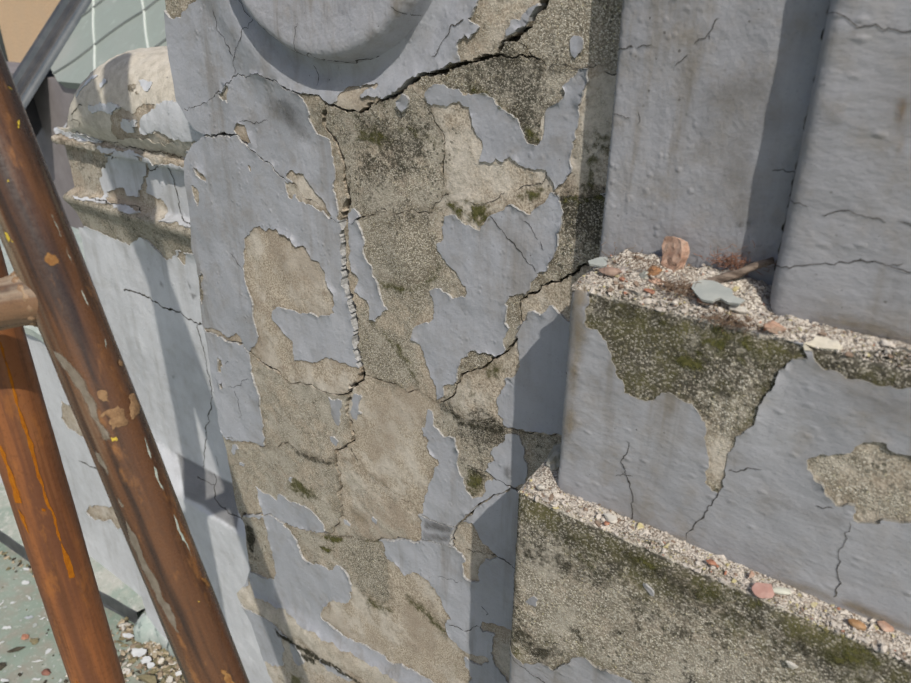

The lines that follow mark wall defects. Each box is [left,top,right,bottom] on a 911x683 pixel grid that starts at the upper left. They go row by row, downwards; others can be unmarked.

crack [351,0,617,111]
crack [831,12,911,33]
peeling [51,46,196,265]
crack [470,175,605,298]
crack [776,260,911,273]
peeling [205,0,911,683]
peeling [61,401,83,436]
crack [124,289,247,475]
peeling [87,505,121,529]
crack [616,442,633,520]
crack [686,492,719,538]
crack [834,524,851,597]